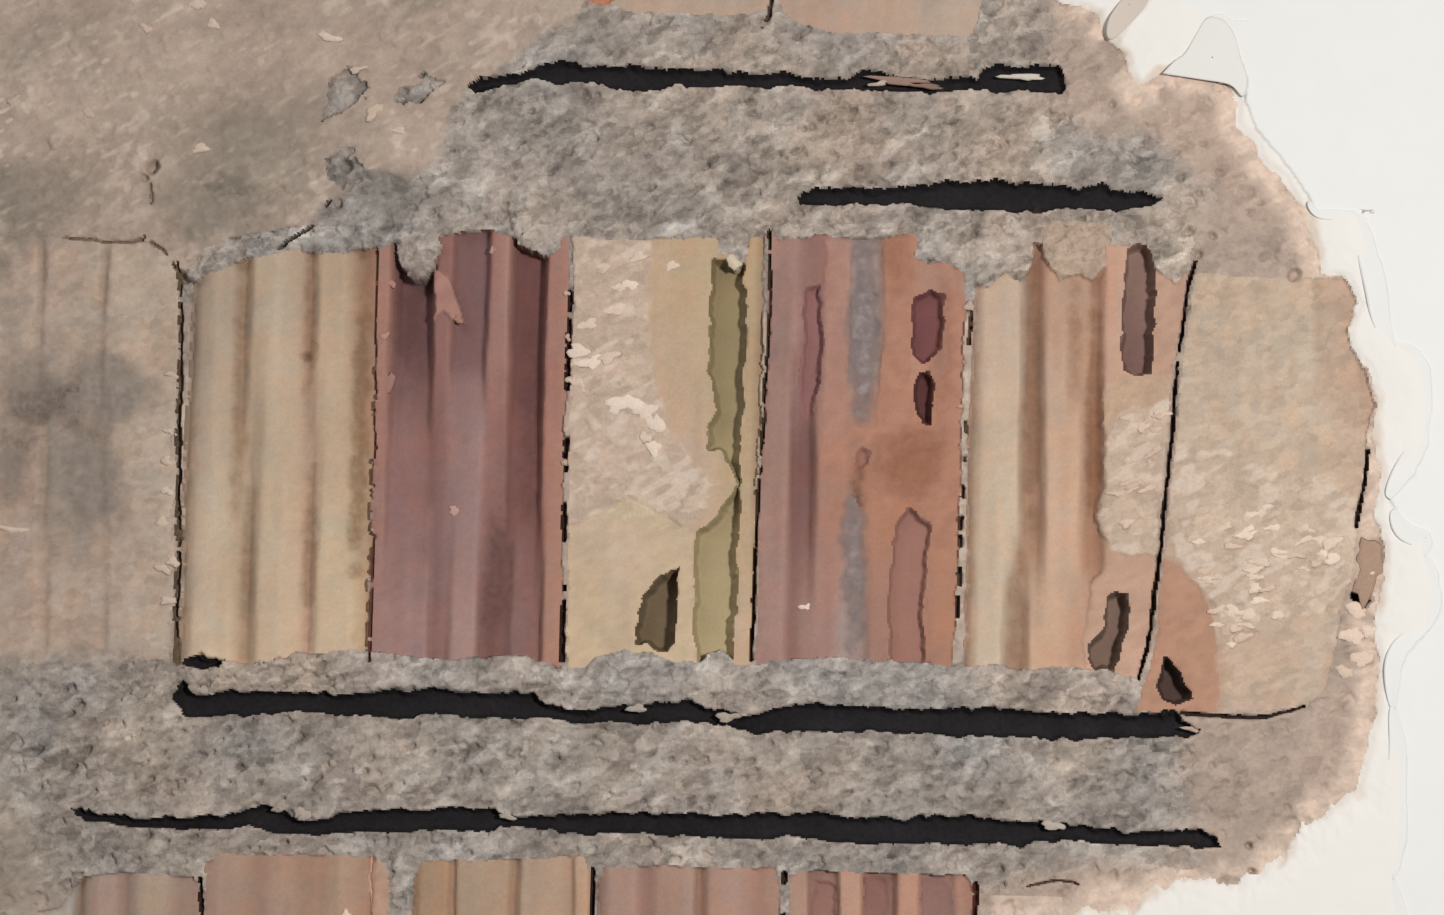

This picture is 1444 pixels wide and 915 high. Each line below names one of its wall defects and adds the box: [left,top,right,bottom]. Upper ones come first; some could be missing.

crack [467,60,1066,95]
peeling [1162,13,1248,97]
crack [147,182,155,204]
crack [277,200,331,250]
crack [797,177,1163,214]
spalling [1117,240,1163,379]
spalling [908,288,950,432]
crack [62,228,1306,742]
spalling [631,254,752,663]
spalling [1084,589,1134,673]
spalling [1153,653,1199,709]
crack [73,798,1221,915]